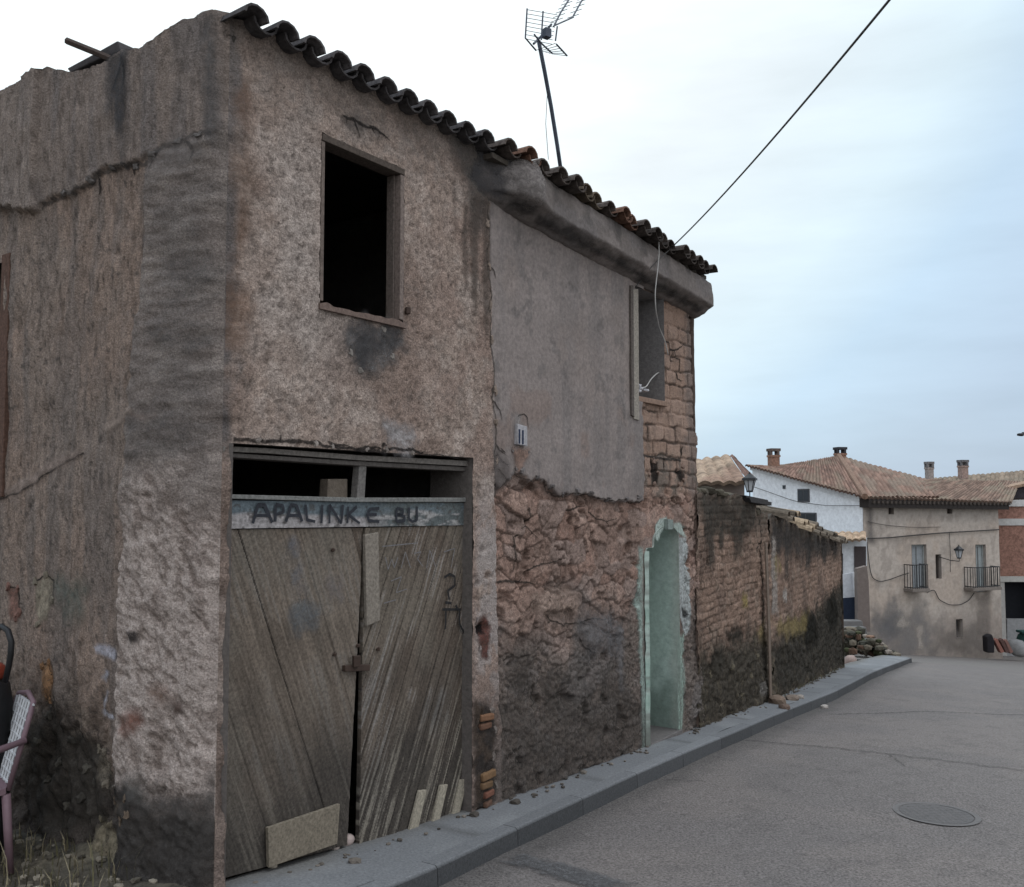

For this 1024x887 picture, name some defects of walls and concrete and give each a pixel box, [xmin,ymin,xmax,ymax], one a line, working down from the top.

crack [343,115,390,141]
water stain [346,320,403,374]
flaking render [494,445,642,504]
hole [475,616,492,658]
flaking render [531,589,578,614]
peeling [634,549,645,748]
peeling [655,517,691,729]
water stain [771,586,844,688]